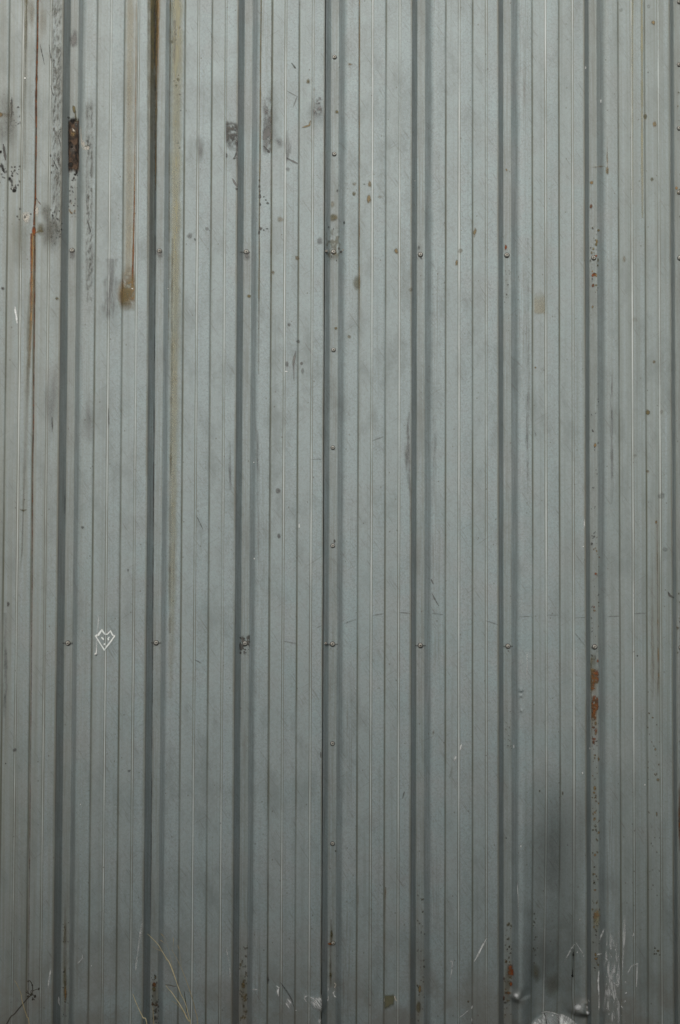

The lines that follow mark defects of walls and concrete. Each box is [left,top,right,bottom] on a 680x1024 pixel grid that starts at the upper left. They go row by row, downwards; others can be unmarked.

corrosion [30,0,43,350]
corrosion [122,173,135,304]
corrosion [591,594,600,968]